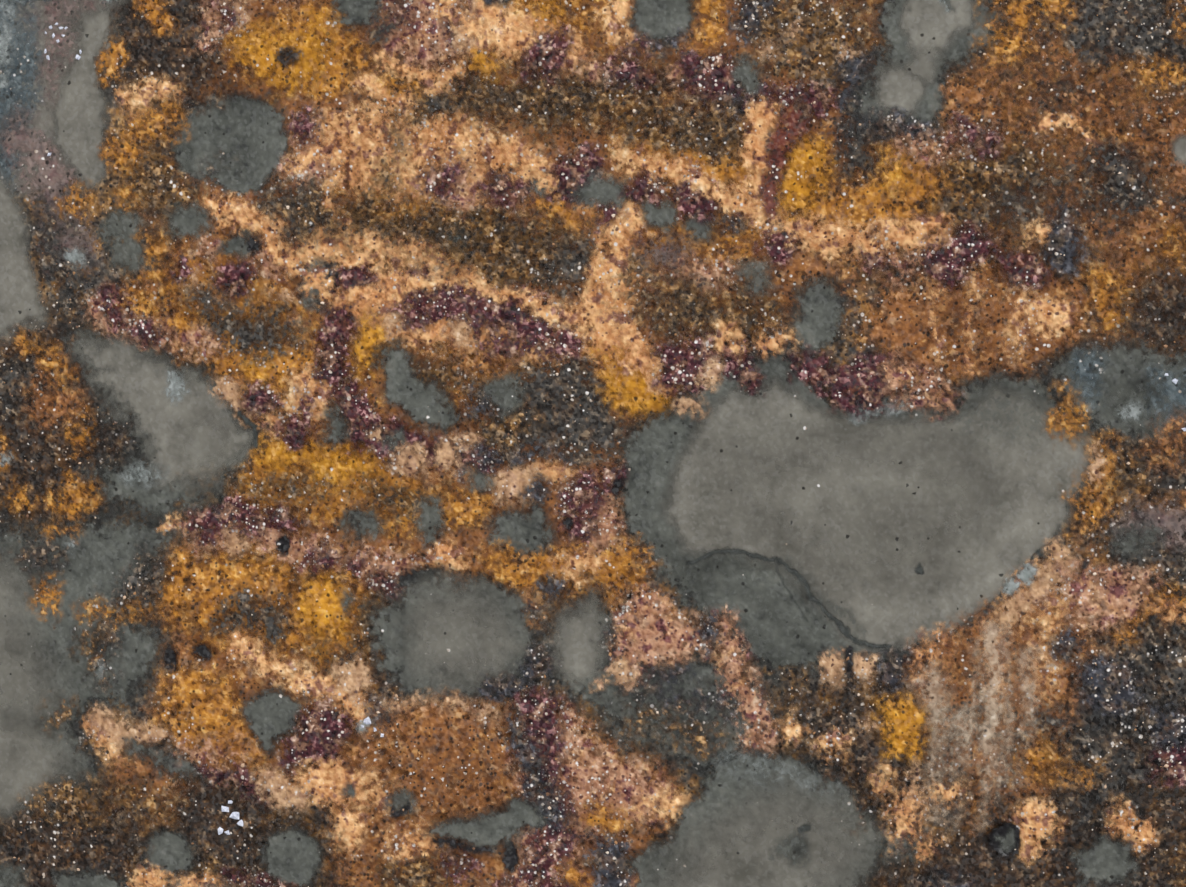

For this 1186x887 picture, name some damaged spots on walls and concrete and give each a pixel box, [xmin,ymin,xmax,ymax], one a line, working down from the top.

corrosion [54,183,94,219]
corrosion [93,0,1186,426]
corrosion [1046,379,1089,439]
corrosion [1061,417,1186,581]
corrosion [0,309,652,887]
crack [687,534,1065,661]
corrosion [1109,563,1186,645]
corrosion [548,697,681,887]
corrosion [772,673,934,816]
corrosion [1012,798,1064,862]
corrosion [1010,743,1099,788]
corrosion [1106,800,1159,852]